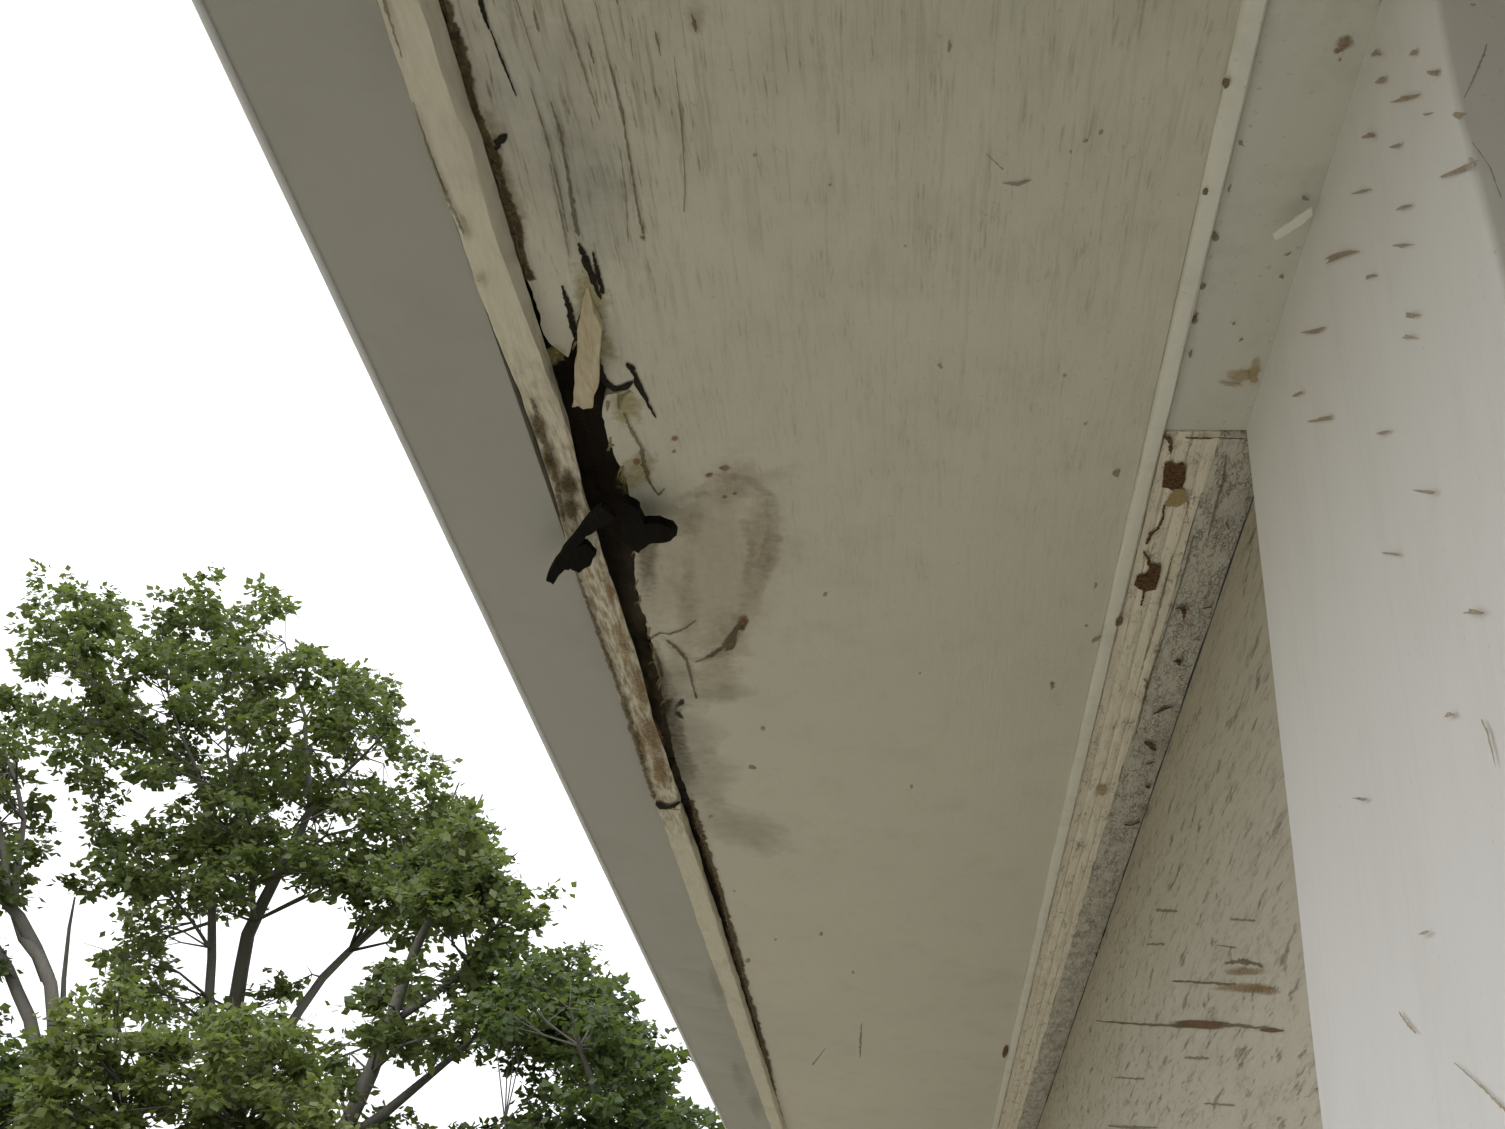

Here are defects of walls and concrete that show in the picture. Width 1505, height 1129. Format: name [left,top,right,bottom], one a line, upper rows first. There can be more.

crack [649,620,745,698]
crack [689,800,782,1115]